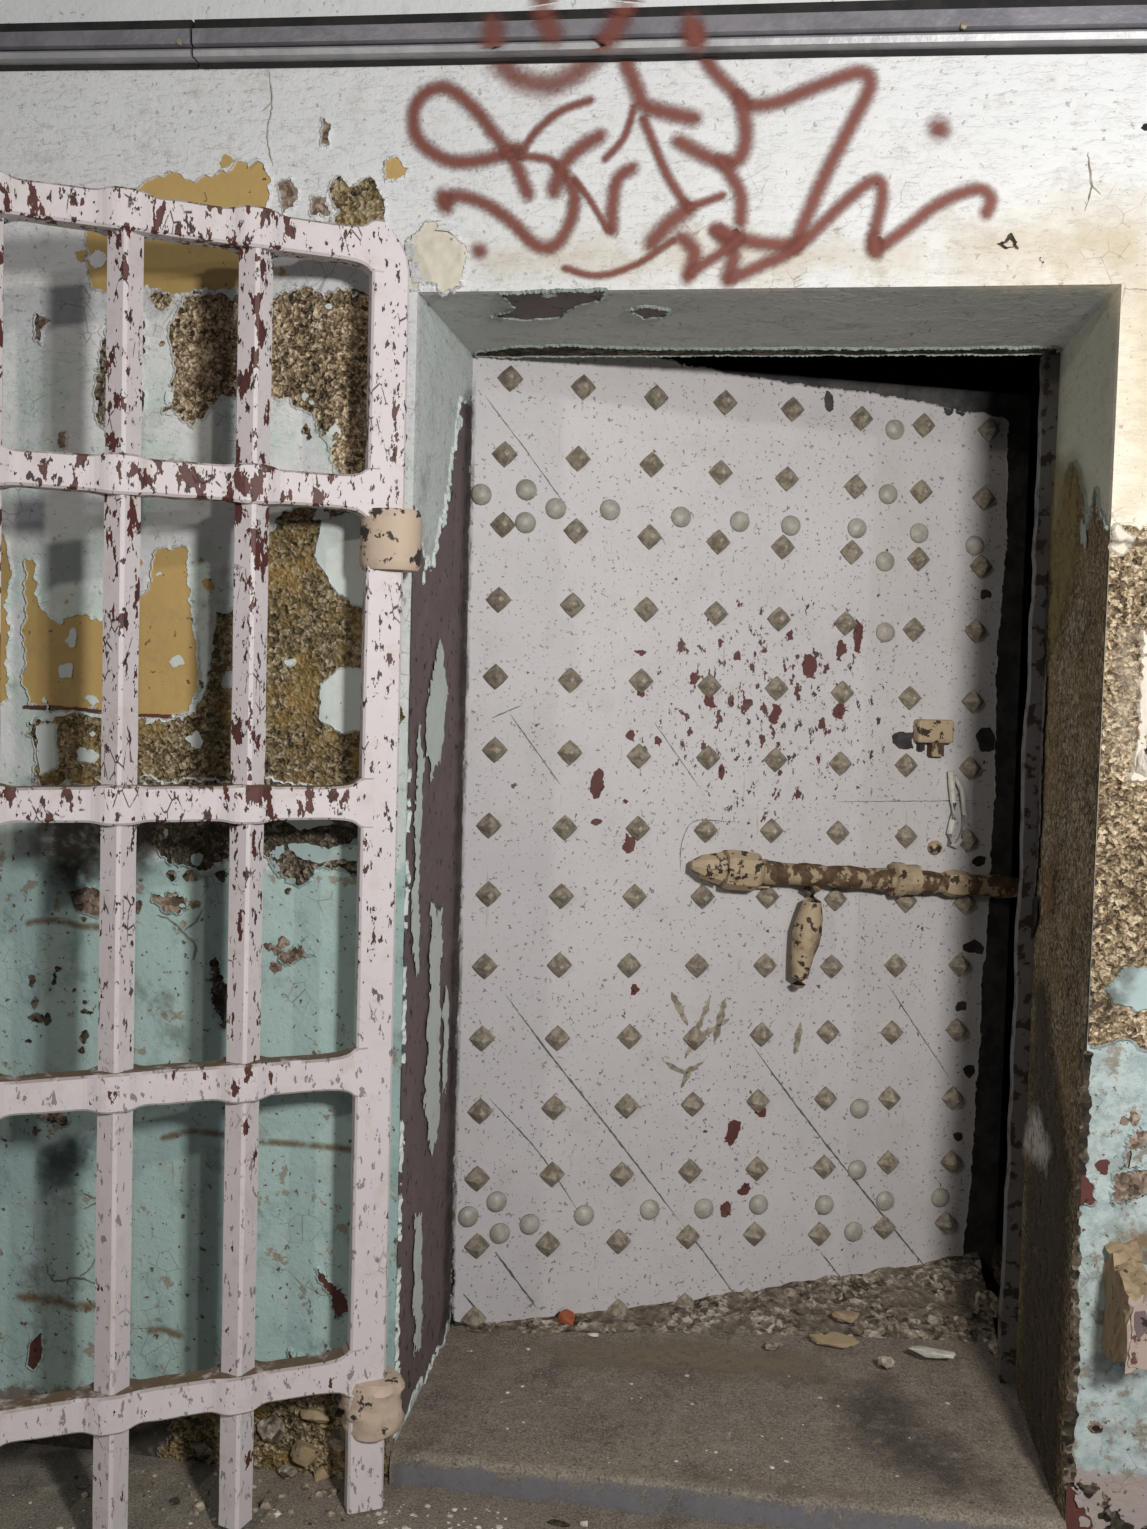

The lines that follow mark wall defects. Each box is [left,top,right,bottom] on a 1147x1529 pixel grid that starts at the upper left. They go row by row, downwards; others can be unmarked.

peeling [32,311,53,347]
peeling [75,230,108,295]
peeling [91,318,107,437]
peeling [142,240,239,430]
peeling [135,154,412,229]
peeling [271,267,369,474]
peeling [0,516,103,786]
peeling [137,544,233,785]
peeling [265,507,363,785]
peeling [136,821,230,927]
peeling [263,820,358,894]
peeling [1015,460,1147,1529]